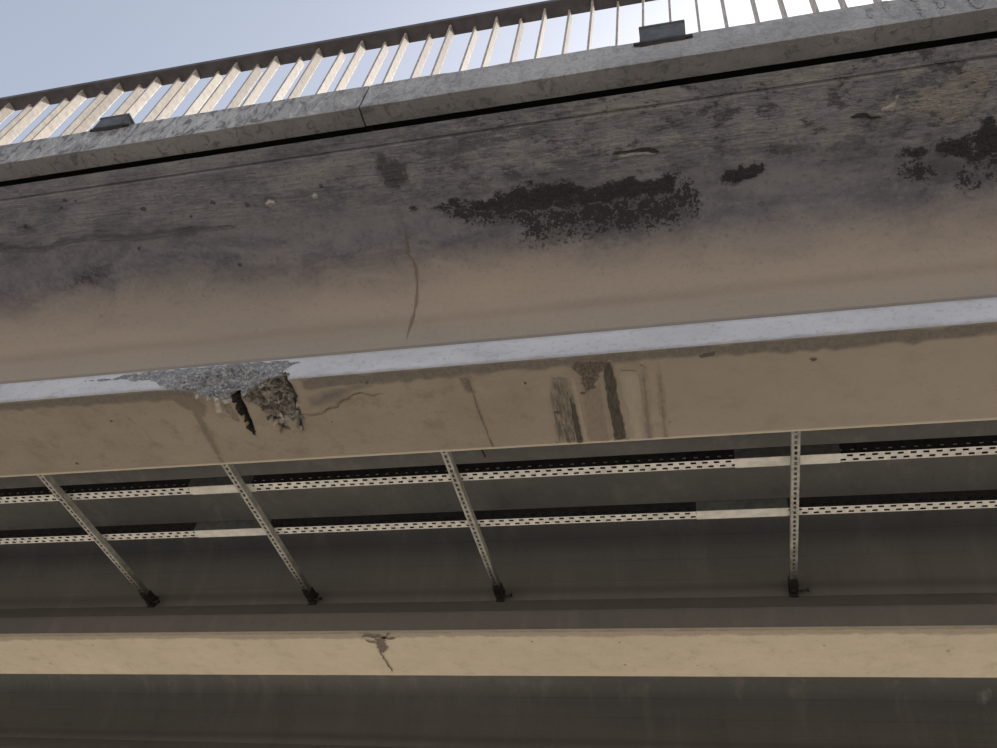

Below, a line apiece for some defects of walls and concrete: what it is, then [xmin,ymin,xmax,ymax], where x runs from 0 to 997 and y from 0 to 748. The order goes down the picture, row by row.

crack [405,230,418,338]
spalling [84,361,305,463]
water stain [297,322,997,409]